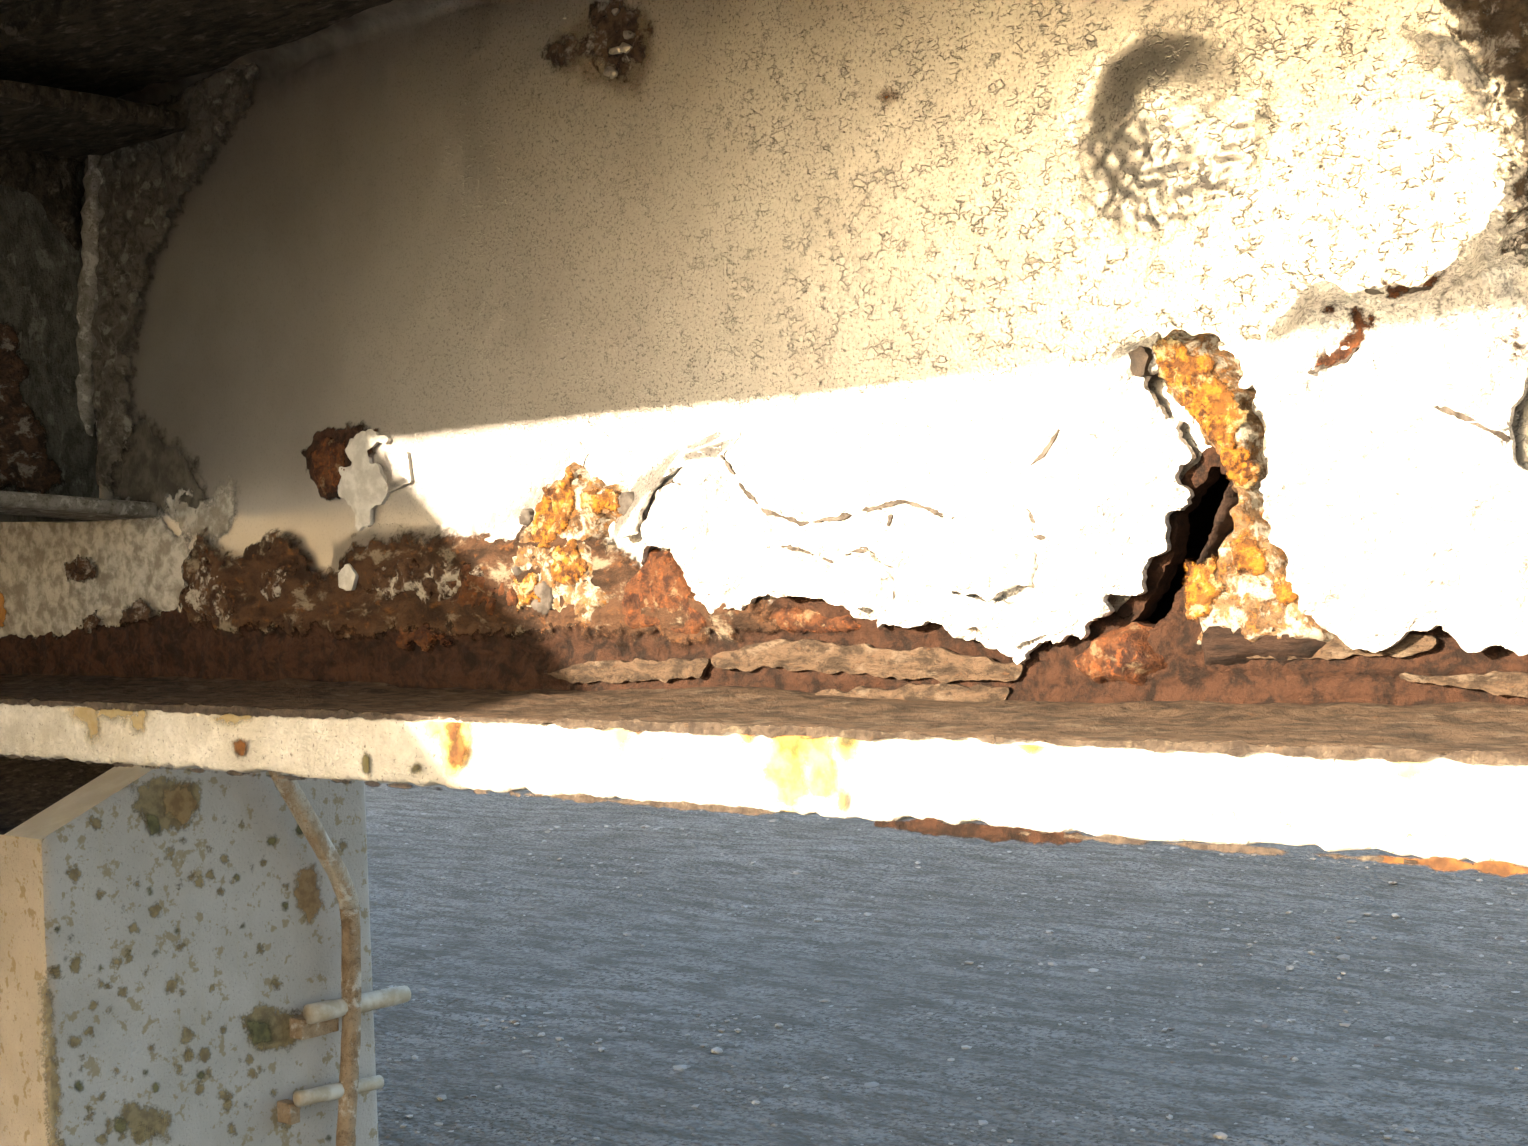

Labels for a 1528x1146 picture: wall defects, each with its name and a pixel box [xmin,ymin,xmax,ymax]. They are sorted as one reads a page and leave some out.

rust [0,322,1528,706]
crack [720,455,954,568]
peeling [639,331,1196,665]
crack [1026,509,1046,540]
crack [1030,429,1060,466]
peeling [1238,159,1528,656]
rust [0,698,1528,860]
rust [178,836,276,895]
rust [282,864,323,923]
rust [38,881,172,1146]
rust [176,1027,247,1135]
rust [208,979,298,1079]